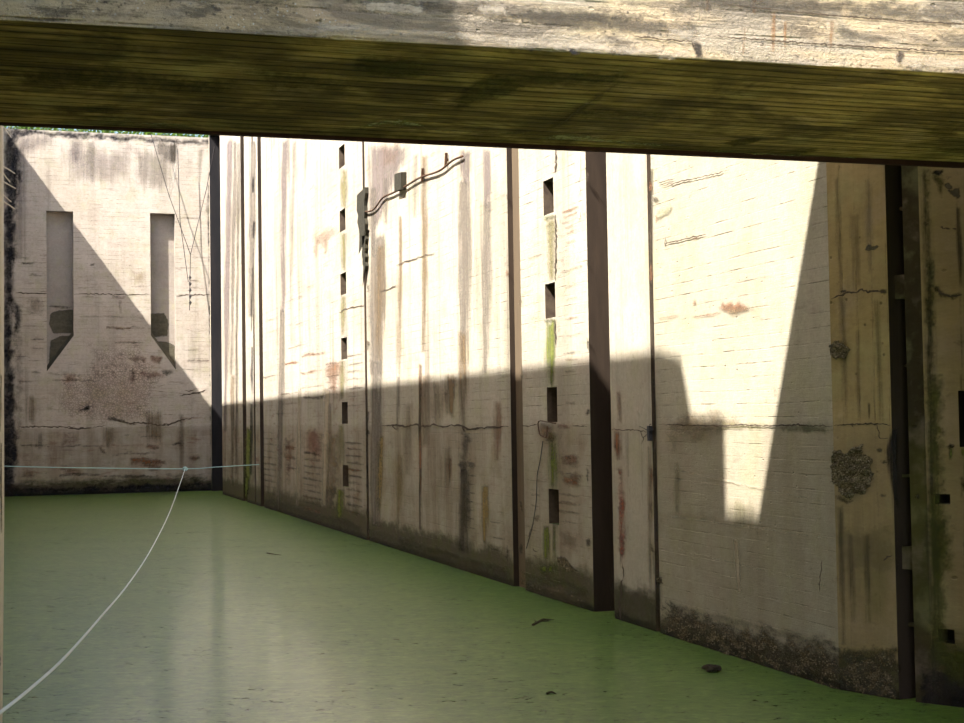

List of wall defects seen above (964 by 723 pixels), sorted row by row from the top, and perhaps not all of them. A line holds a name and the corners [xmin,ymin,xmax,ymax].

rust [695,302,746,317]
water stain [265,142,506,577]
spalling [829,341,850,360]
crack [0,376,191,430]
crack [379,423,537,431]
crack [612,423,889,444]
spalling [830,430,898,504]
water stain [916,282,964,708]